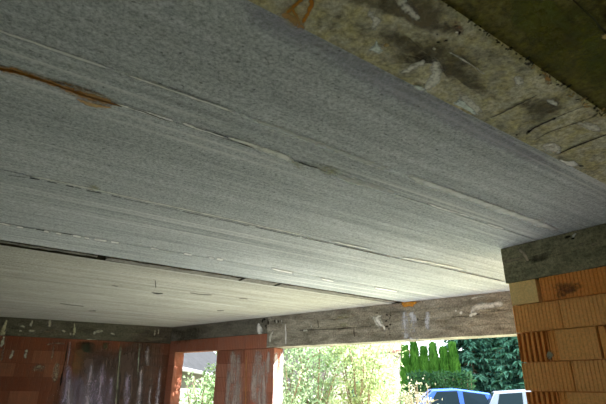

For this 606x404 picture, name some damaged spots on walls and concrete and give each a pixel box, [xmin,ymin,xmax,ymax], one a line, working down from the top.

rust [282,0,314,29]
damp [368,0,455,33]
damp [370,34,487,92]
rust [0,67,121,108]
crack [490,95,536,118]
damp [521,98,562,121]
crack [516,106,596,140]
crack [559,134,606,154]
crack [9,175,504,282]